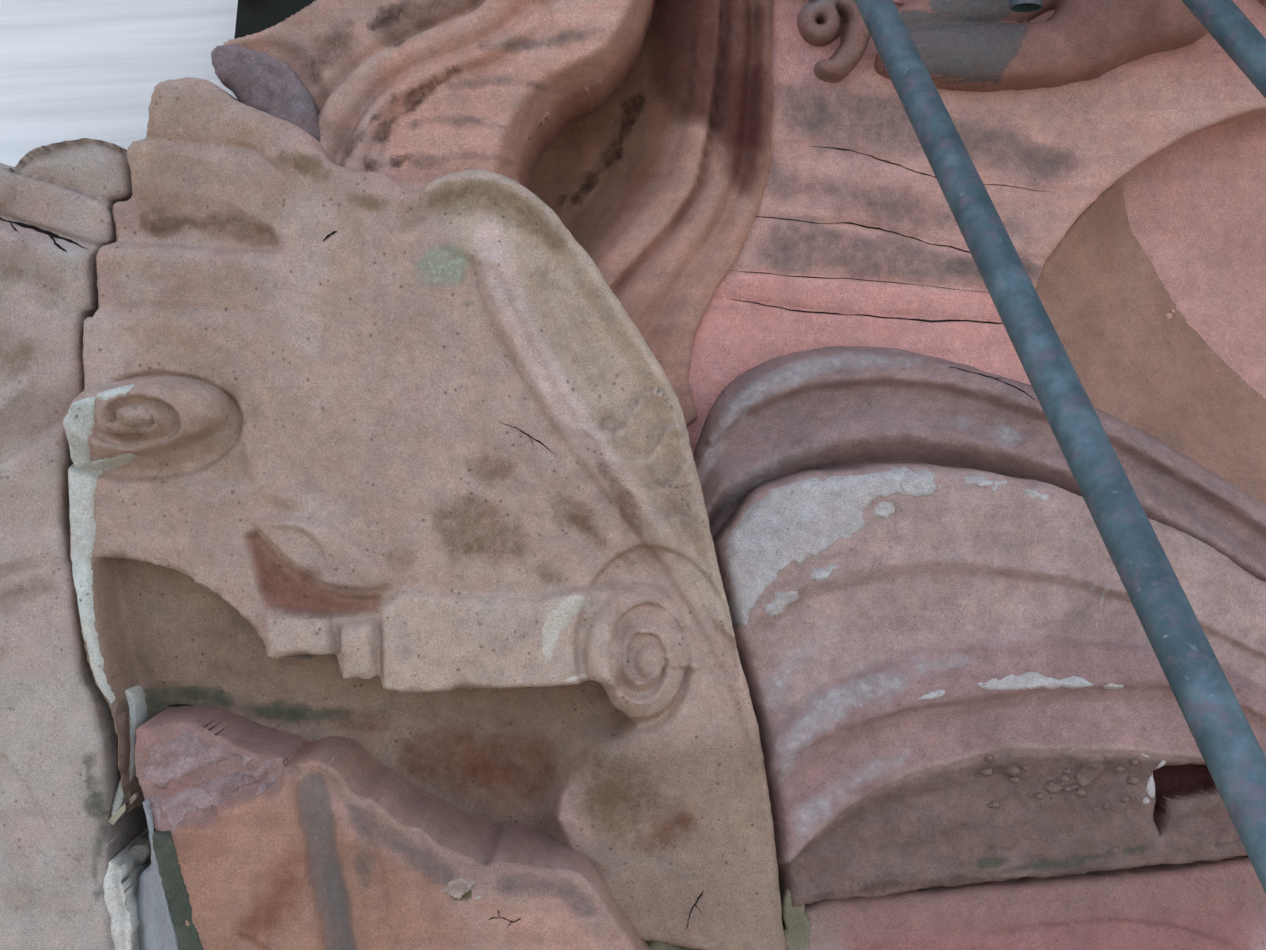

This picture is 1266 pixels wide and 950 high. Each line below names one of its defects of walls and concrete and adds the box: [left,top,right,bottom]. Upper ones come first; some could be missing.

crack [809,146,936,178]
crack [0,217,87,252]
crack [755,216,970,253]
crack [731,270,1003,324]
crack [949,367,1034,399]
peeling [964,474,1007,492]
peeling [724,467,942,626]
peeling [918,689,945,700]
peeling [977,672,1124,690]
spalling [1140,754,1217,825]
spalling [128,705,651,950]